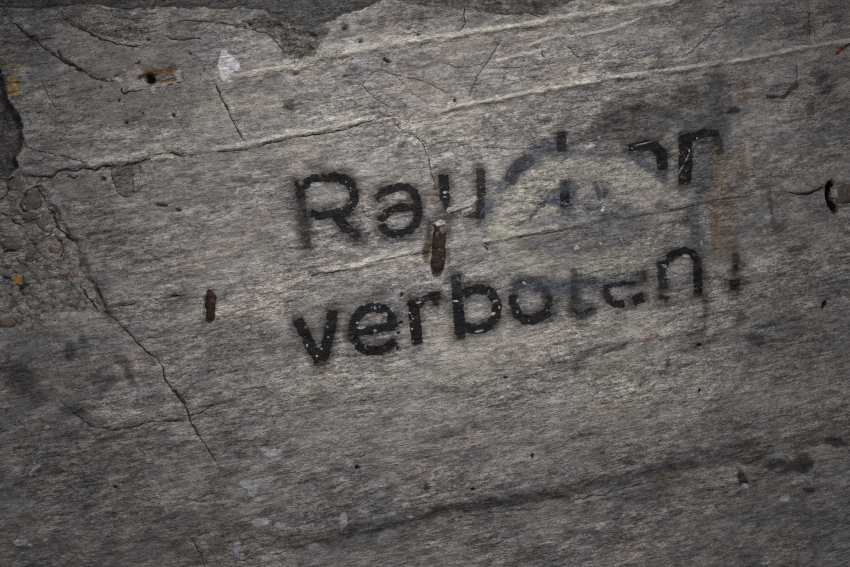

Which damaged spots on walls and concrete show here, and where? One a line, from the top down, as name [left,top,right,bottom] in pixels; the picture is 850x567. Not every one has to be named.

rust [138,66,176,83]
crack [4,11,618,196]
crack [62,287,222,471]